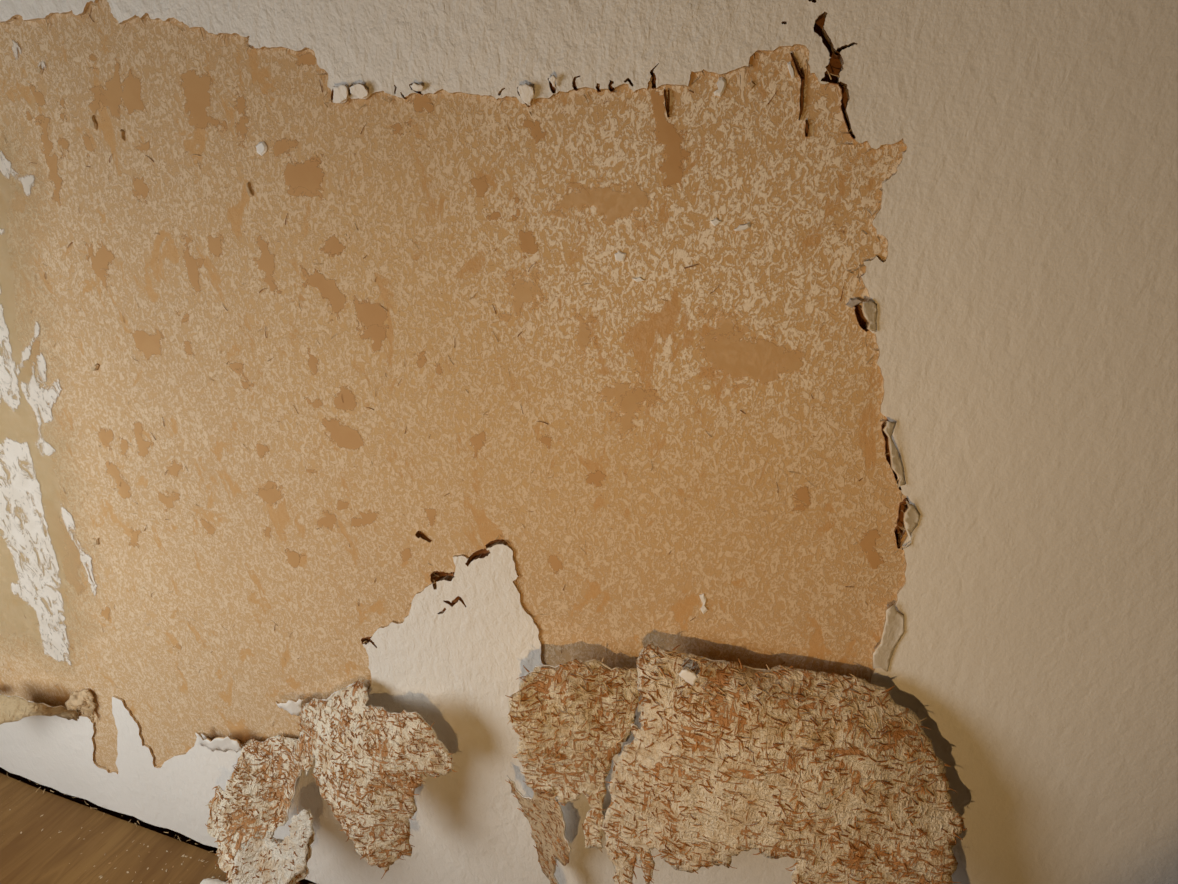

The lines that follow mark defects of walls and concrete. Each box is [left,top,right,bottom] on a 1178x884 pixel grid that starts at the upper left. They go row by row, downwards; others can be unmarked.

peeling [0,0,920,884]
crack [814,12,857,139]